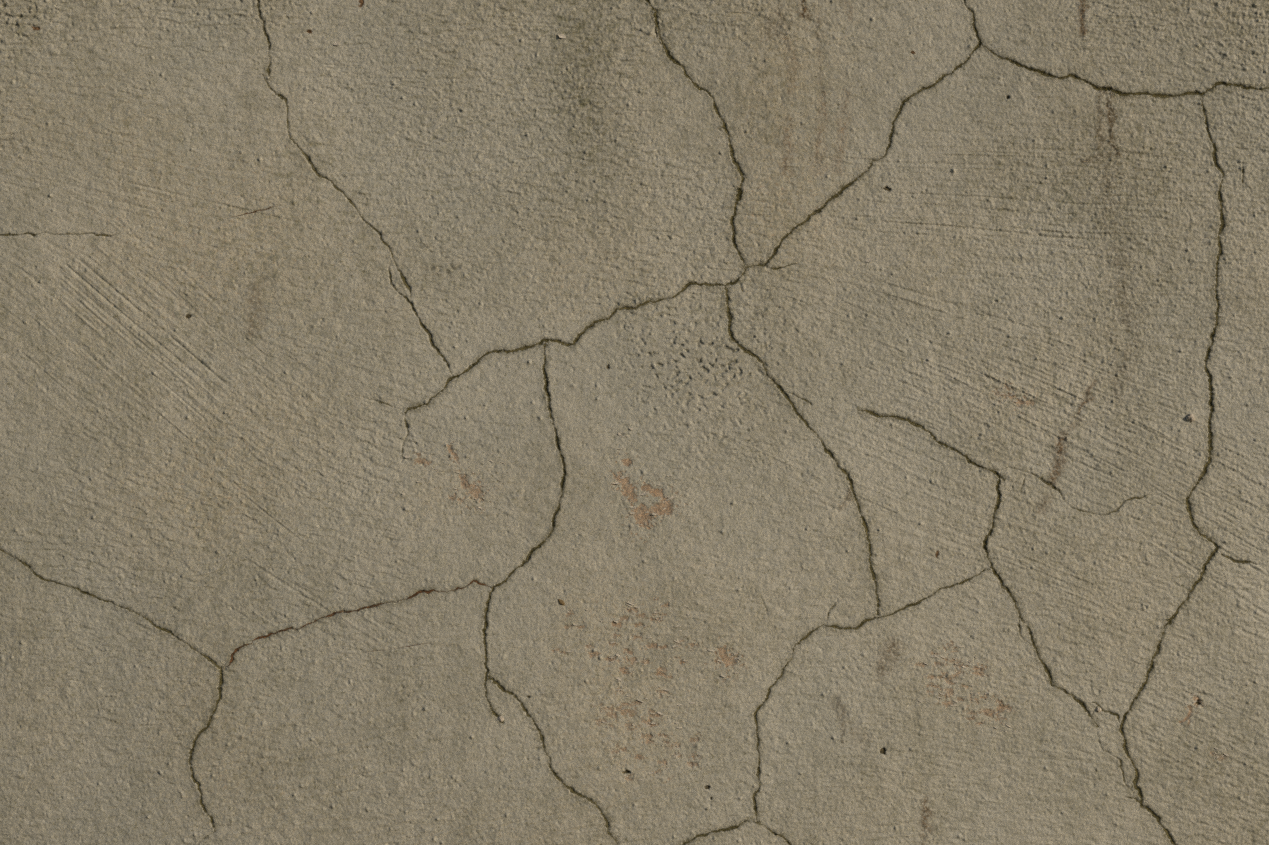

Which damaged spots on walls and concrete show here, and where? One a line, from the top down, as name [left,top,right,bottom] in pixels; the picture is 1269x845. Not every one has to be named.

crack [0,230,109,238]
crack [257,0,1267,845]
crack [0,549,382,831]